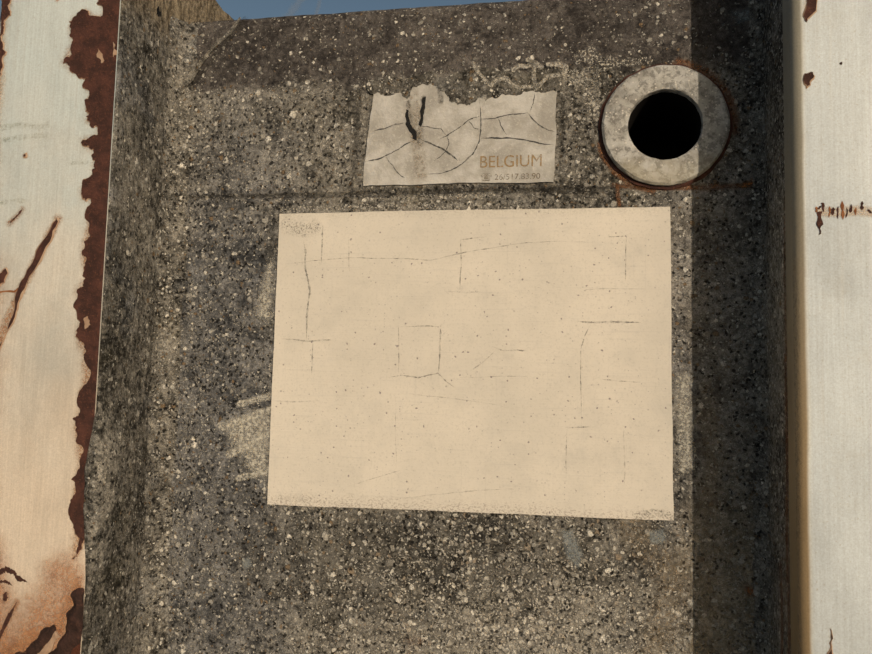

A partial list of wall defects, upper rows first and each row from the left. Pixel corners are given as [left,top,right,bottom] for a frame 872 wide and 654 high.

peeling [0,0,12,76]
crack [365,95,552,177]
rust [598,60,753,205]
peeling [0,267,9,286]
peeling [63,0,120,560]
peeling [0,566,27,604]
rust [0,561,83,654]